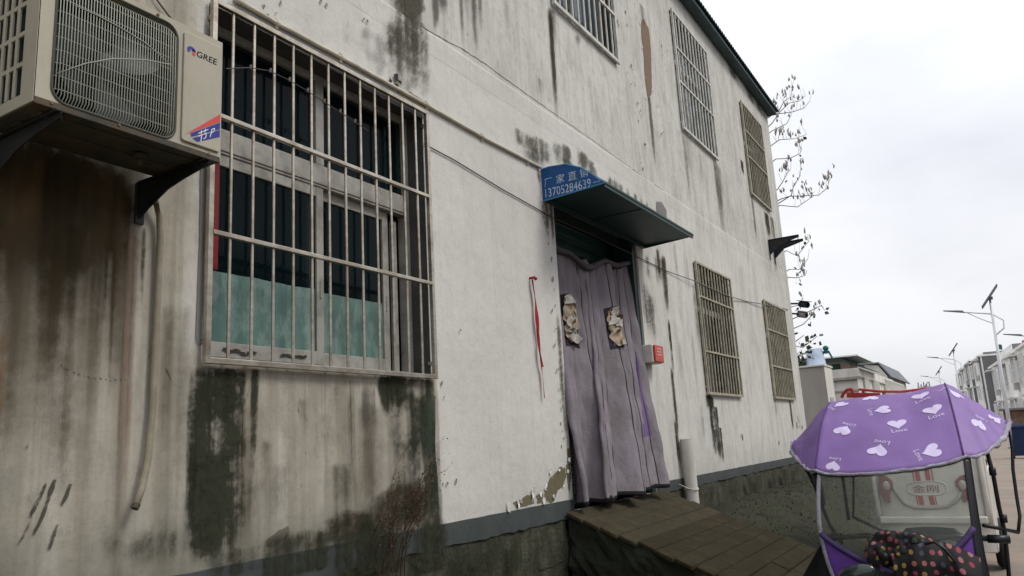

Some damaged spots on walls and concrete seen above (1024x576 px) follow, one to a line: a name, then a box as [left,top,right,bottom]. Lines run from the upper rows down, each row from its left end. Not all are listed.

damp [365,0,447,87]
damp [460,0,482,35]
damp [517,129,647,205]
damp [0,141,146,374]
damp [543,203,554,234]
damp [647,251,669,306]
flaking render [507,325,571,512]
damp [668,322,680,459]
damp [706,395,724,458]
damp [187,369,259,576]
damp [265,376,447,576]